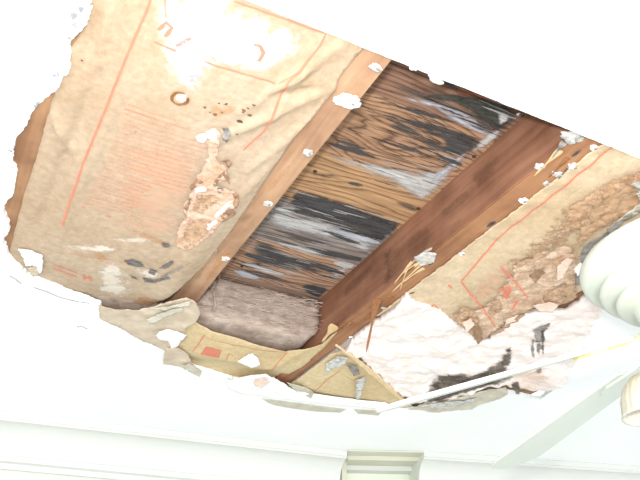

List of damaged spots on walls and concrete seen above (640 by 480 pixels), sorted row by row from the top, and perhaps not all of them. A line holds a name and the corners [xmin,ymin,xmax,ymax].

peeling [24,5,93,118]
peeling [1,141,17,196]
damp [327,82,516,200]
damp [229,187,402,297]
peeling [574,182,640,276]
peeling [226,379,388,416]
damp [427,348,521,403]
damp [531,323,550,357]